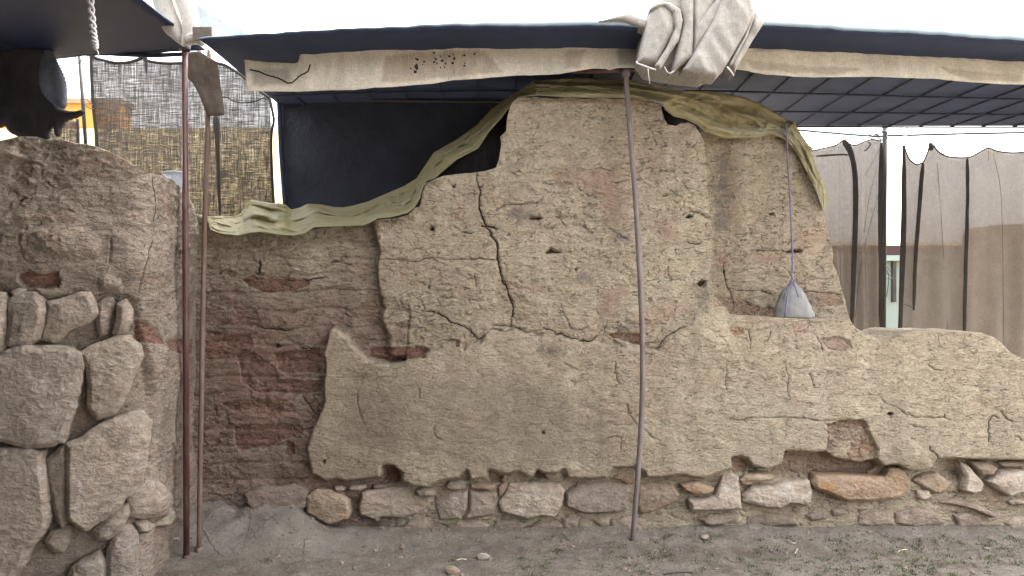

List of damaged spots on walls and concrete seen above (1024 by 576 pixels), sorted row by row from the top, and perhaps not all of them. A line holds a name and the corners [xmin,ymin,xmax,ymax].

crack [377,167,622,345]
spalling [244,275,310,293]
spalling [205,332,322,394]
spalling [235,424,303,455]
spalling [731,457,746,471]
spalling [770,420,875,473]